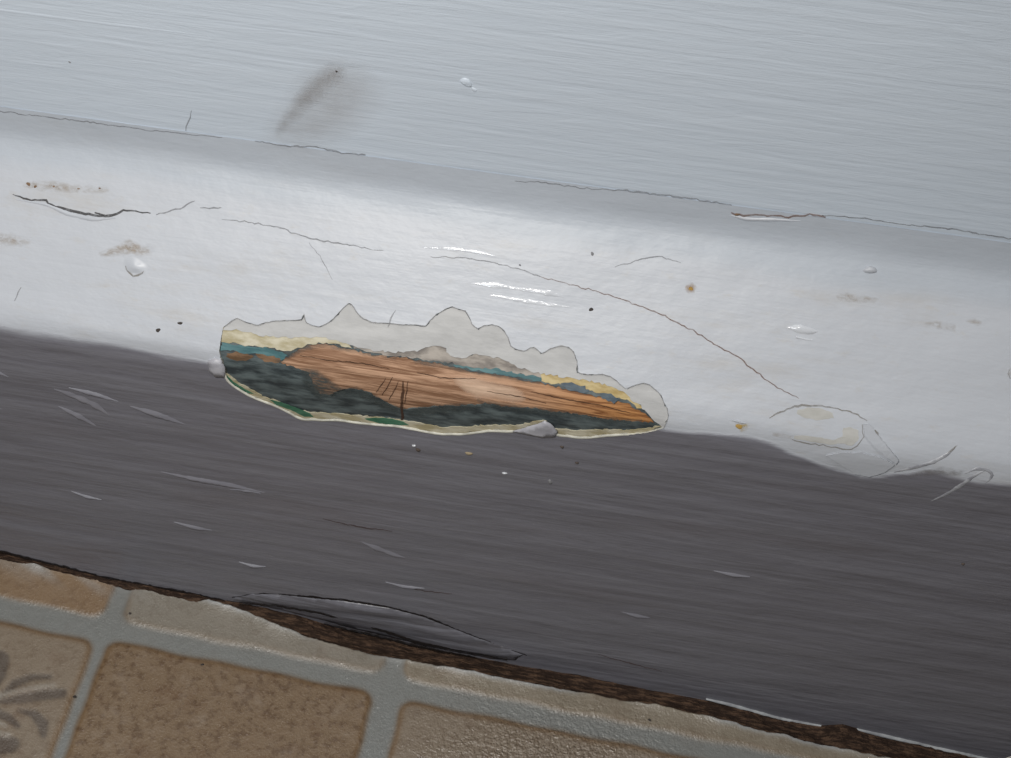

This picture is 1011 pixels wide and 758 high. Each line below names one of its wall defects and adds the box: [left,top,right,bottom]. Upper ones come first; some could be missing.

crack [13,194,150,221]
peeling [208,303,669,439]
crack [544,278,799,399]